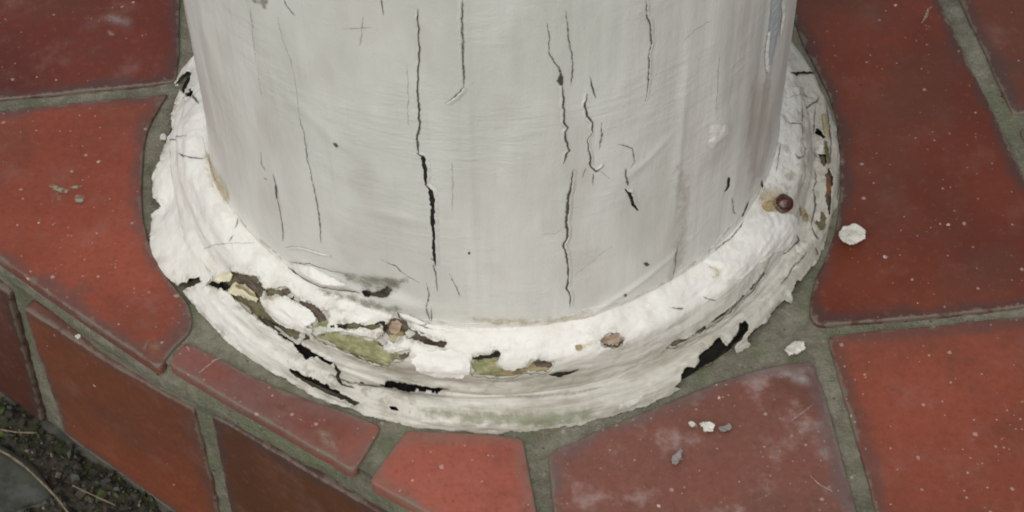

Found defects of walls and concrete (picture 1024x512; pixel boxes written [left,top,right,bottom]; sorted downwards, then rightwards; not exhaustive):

crack [260,118,343,274]
crack [380,8,460,321]
crack [547,17,641,308]
peeling [781,82,832,290]
peeling [182,271,447,368]
spalling [293,370,350,398]
spalling [381,381,446,393]
peeling [418,417,453,426]
peeling [470,350,579,379]
spalling [666,272,781,380]